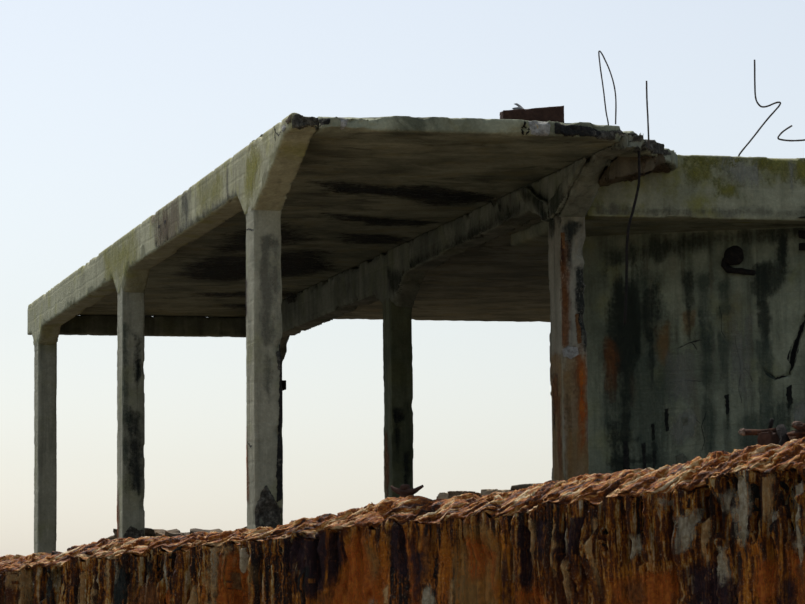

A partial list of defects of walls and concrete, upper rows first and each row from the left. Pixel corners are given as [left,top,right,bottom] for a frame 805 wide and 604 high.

spalling [528,51,672,187]
rust [560,238,570,347]
rust [552,355,587,481]
damp [605,278,670,470]
damp [610,228,804,453]
crack [719,306,805,402]
rust [281,532,348,599]
rust [387,526,424,601]
rust [517,520,546,594]
rust [552,517,585,570]
rust [610,561,738,604]